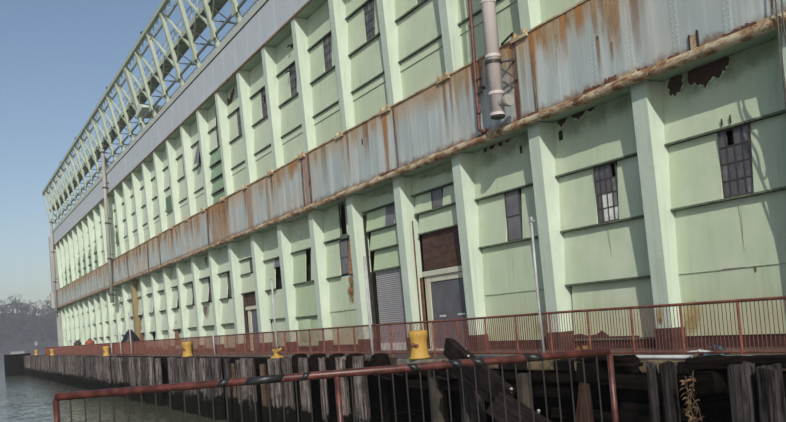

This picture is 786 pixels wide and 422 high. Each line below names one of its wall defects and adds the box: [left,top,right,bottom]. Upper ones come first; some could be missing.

corrosion [424,57,487,110]
corrosion [499,0,619,119]
peeling [667,57,730,97]
corrosion [340,105,399,170]
peeling [557,107,594,128]
corrosion [243,145,324,228]
corrosion [62,197,228,302]